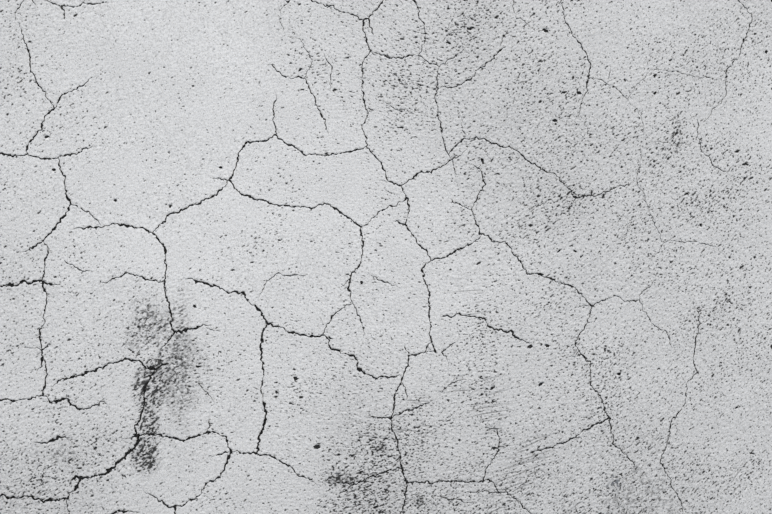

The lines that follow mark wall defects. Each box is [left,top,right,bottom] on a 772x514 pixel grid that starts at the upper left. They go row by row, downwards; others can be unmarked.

crack [45,0,108,19]
crack [560,0,763,172]
crack [0,23,106,410]
crack [72,0,635,514]
crack [614,277,675,349]
crack [650,214,719,257]
crack [0,348,314,514]
crack [660,310,701,511]